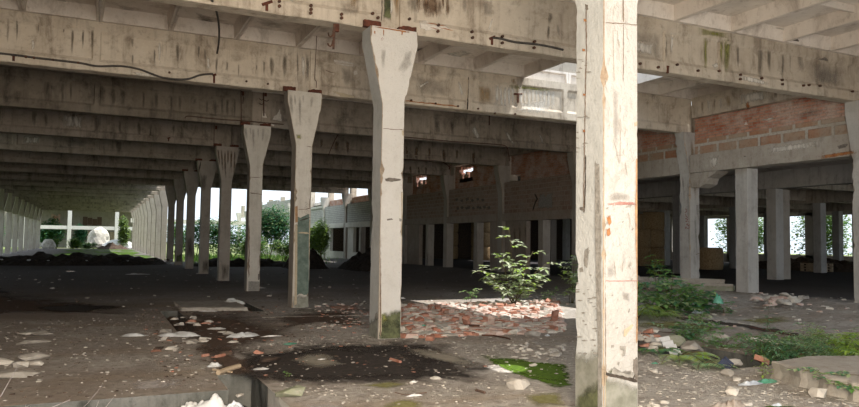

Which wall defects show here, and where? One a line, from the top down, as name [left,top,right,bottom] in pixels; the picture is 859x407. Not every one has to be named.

leakage [412,0,449,15]
leakage [703,29,730,67]
spalling [575,159,638,407]